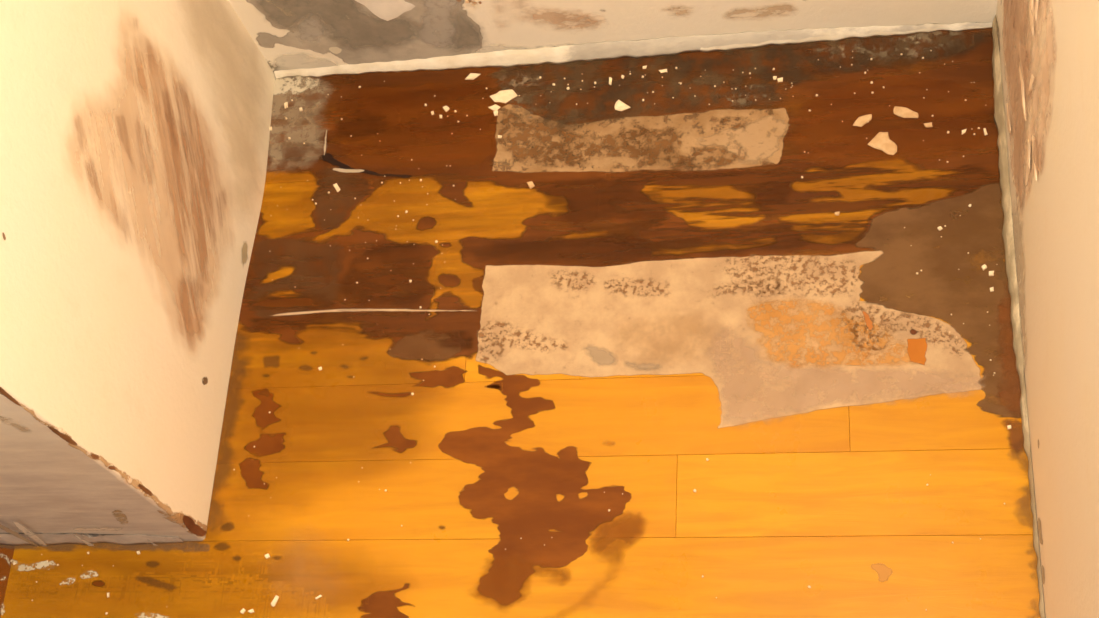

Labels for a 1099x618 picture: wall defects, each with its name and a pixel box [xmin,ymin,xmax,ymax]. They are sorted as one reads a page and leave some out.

damp [167,111,210,270]
peeling [488,89,789,189]
damp [238,0,1054,606]
peeling [476,250,982,428]
spalling [159,511,207,536]